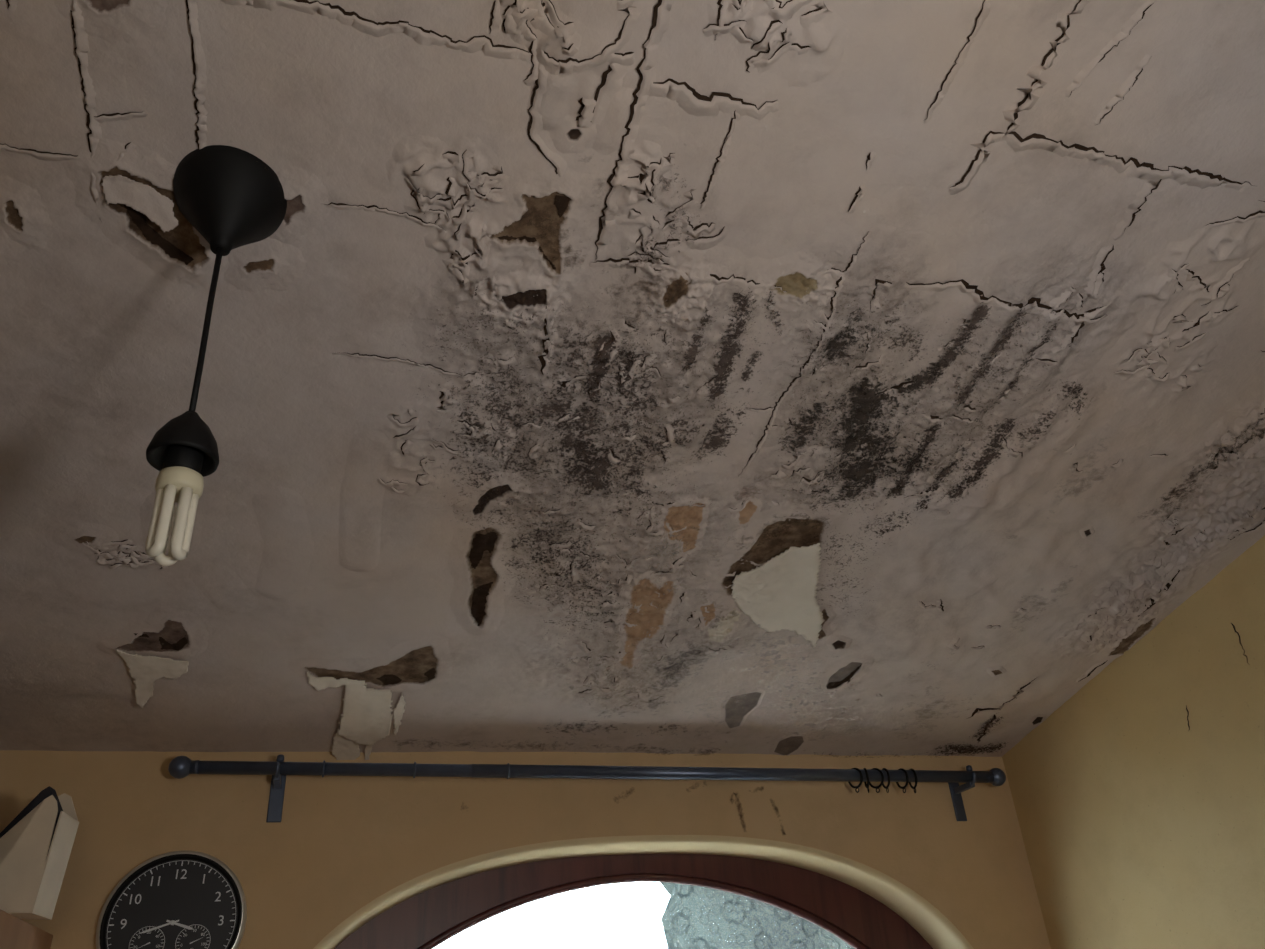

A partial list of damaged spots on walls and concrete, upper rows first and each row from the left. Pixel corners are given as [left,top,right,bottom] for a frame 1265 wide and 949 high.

spalling [63,138,332,295]
crack [186,0,787,292]
spalling [452,466,534,569]
spalling [455,167,605,329]
crack [538,304,640,396]
damp [431,282,781,630]
spalling [611,497,854,670]
crack [738,152,876,477]
damp [770,300,1056,613]
damp [1049,381,1087,413]
crack [901,0,1265,355]
peeling [287,635,454,760]